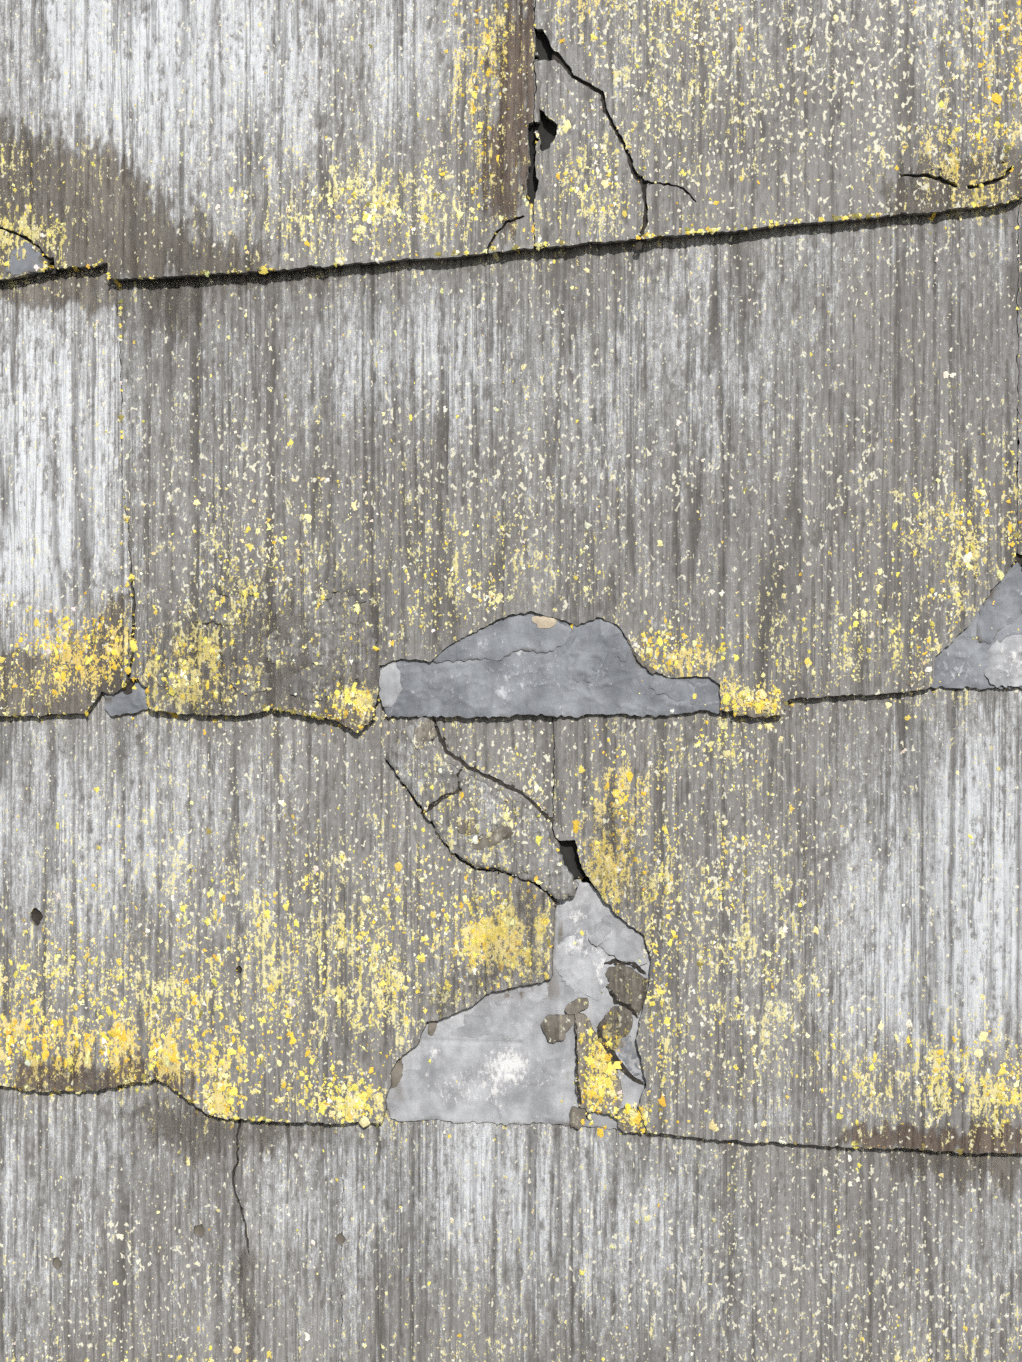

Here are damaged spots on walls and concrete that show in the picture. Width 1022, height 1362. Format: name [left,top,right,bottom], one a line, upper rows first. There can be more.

crack [487,216,524,253]
crack [552,52,696,251]
crack [901,167,1012,189]
peeling [192,576,258,627]
spalling [906,562,1022,690]
crack [1014,554,1022,566]
spalling [230,576,721,1133]
crack [233,1119,249,1249]